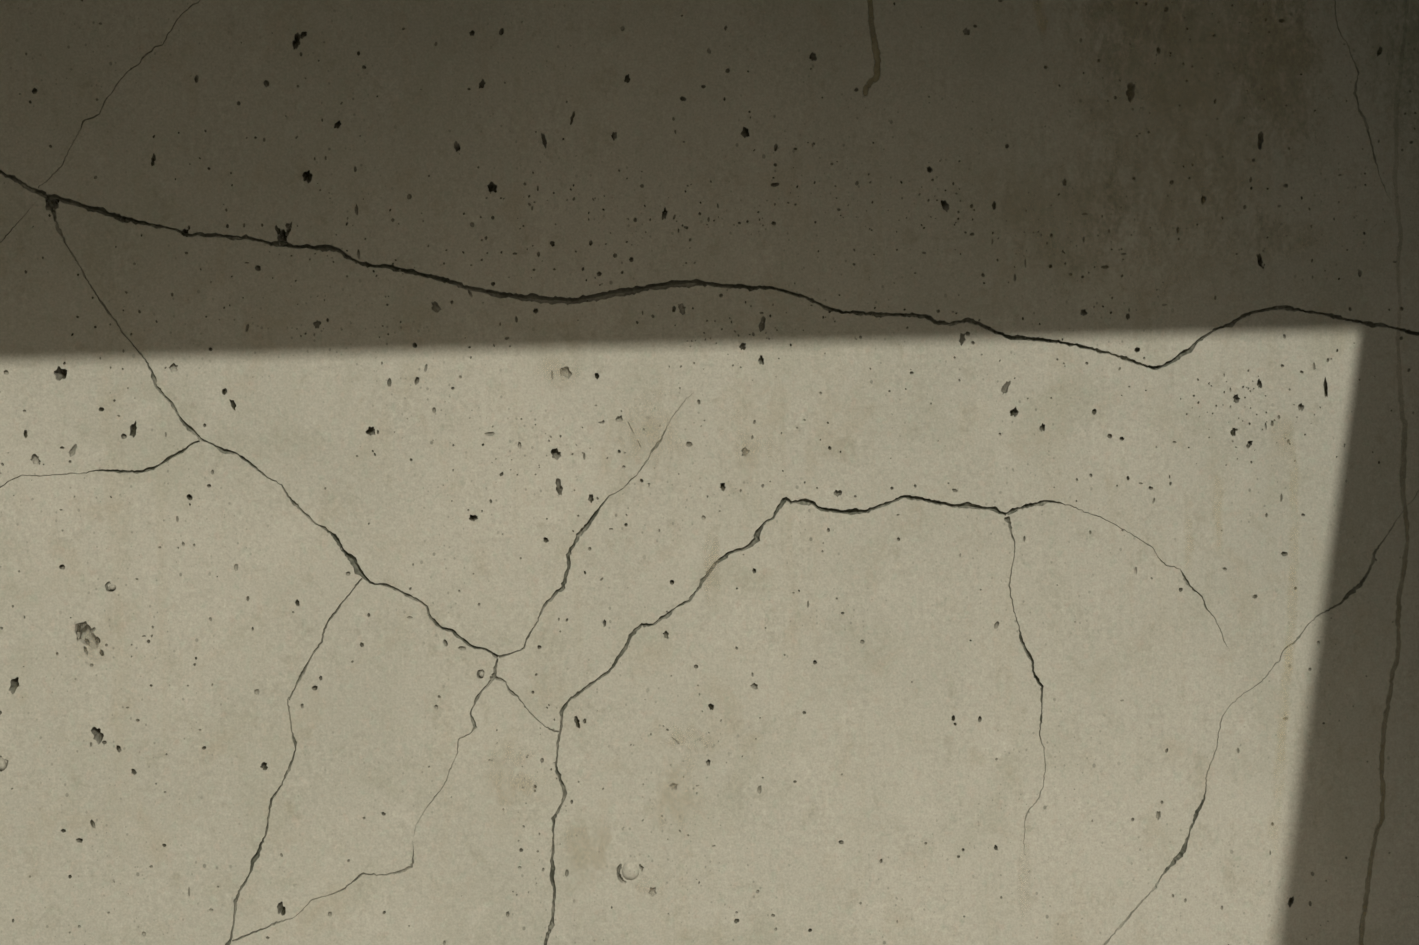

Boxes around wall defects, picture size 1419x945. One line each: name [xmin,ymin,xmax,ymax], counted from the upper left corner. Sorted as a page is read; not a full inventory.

crack [76,0,200,137]
crack [0,170,1419,370]
crack [0,198,693,945]
crack [414,495,1230,945]
crack [1103,490,1419,945]